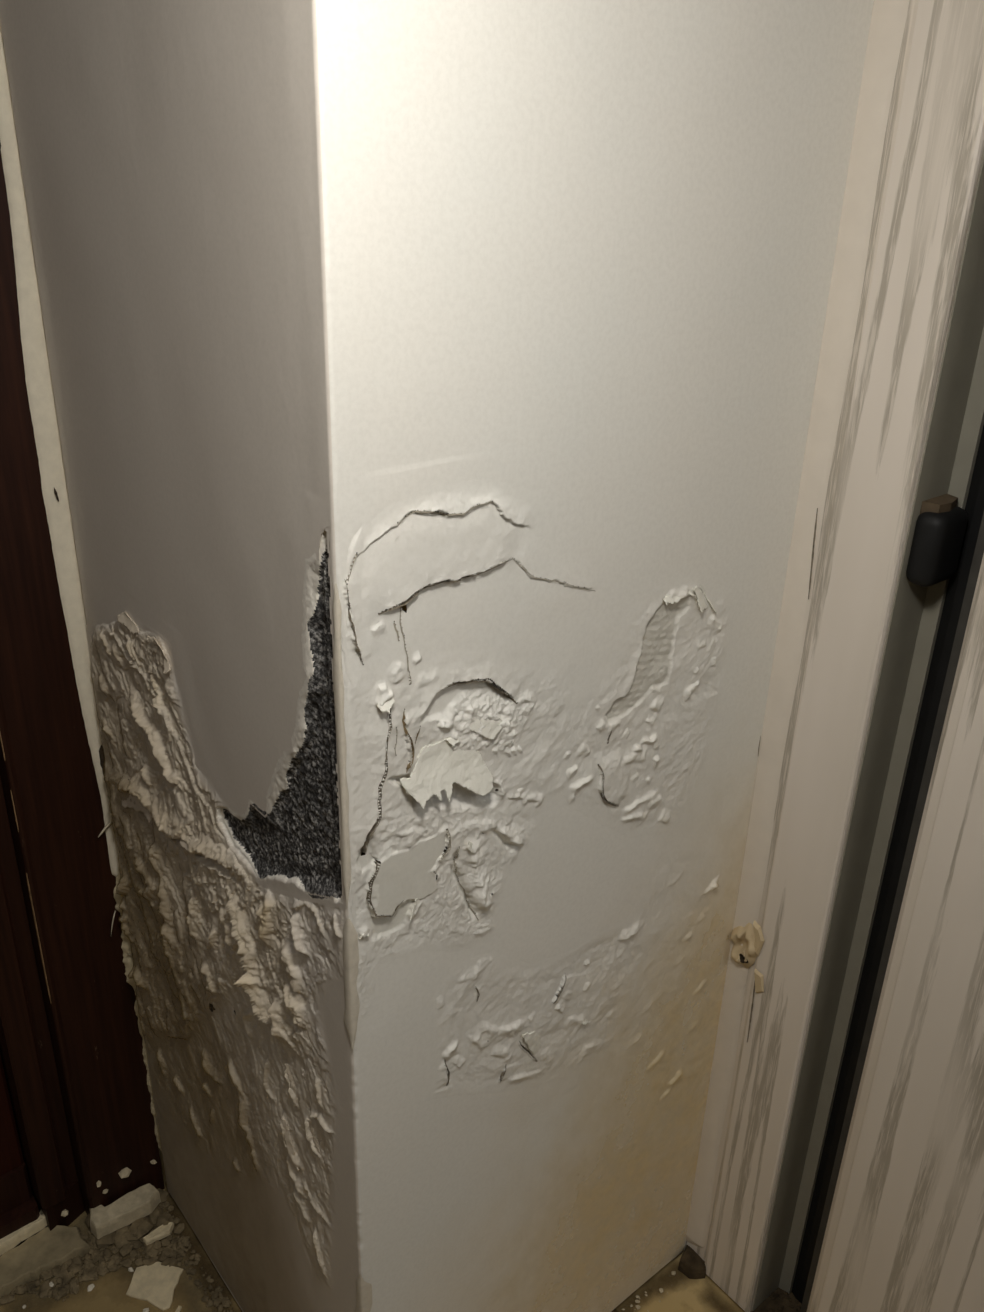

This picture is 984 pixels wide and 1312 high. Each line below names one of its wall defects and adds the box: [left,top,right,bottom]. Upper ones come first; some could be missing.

crack [398,502,492,524]
peeling [86,522,736,1295]
crack [345,555,595,920]